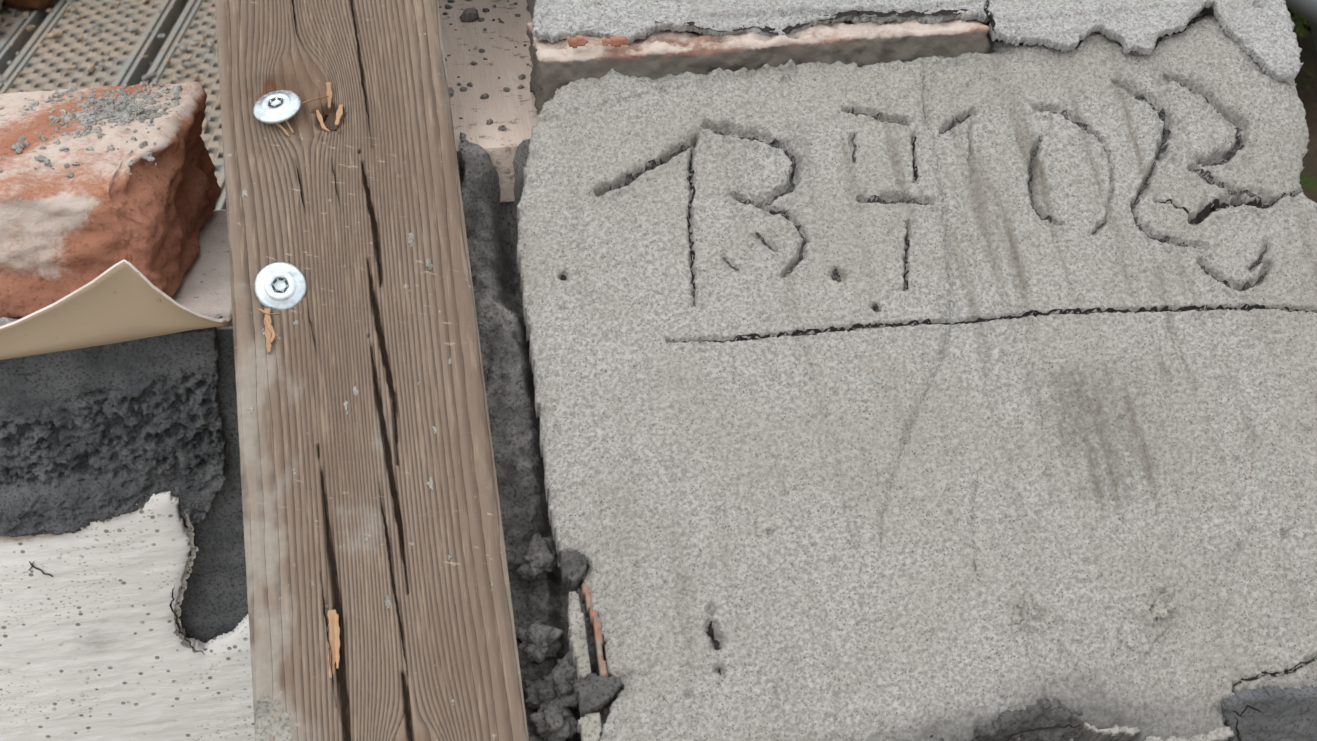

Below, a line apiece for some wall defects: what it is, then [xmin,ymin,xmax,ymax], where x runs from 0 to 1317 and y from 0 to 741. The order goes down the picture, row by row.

crack [655,0,1083,48]
crack [1116,14,1208,53]
spalling [558,550,621,741]
spalling [706,621,720,650]
spalling [972,685,1317,741]
crack [1233,656,1317,741]